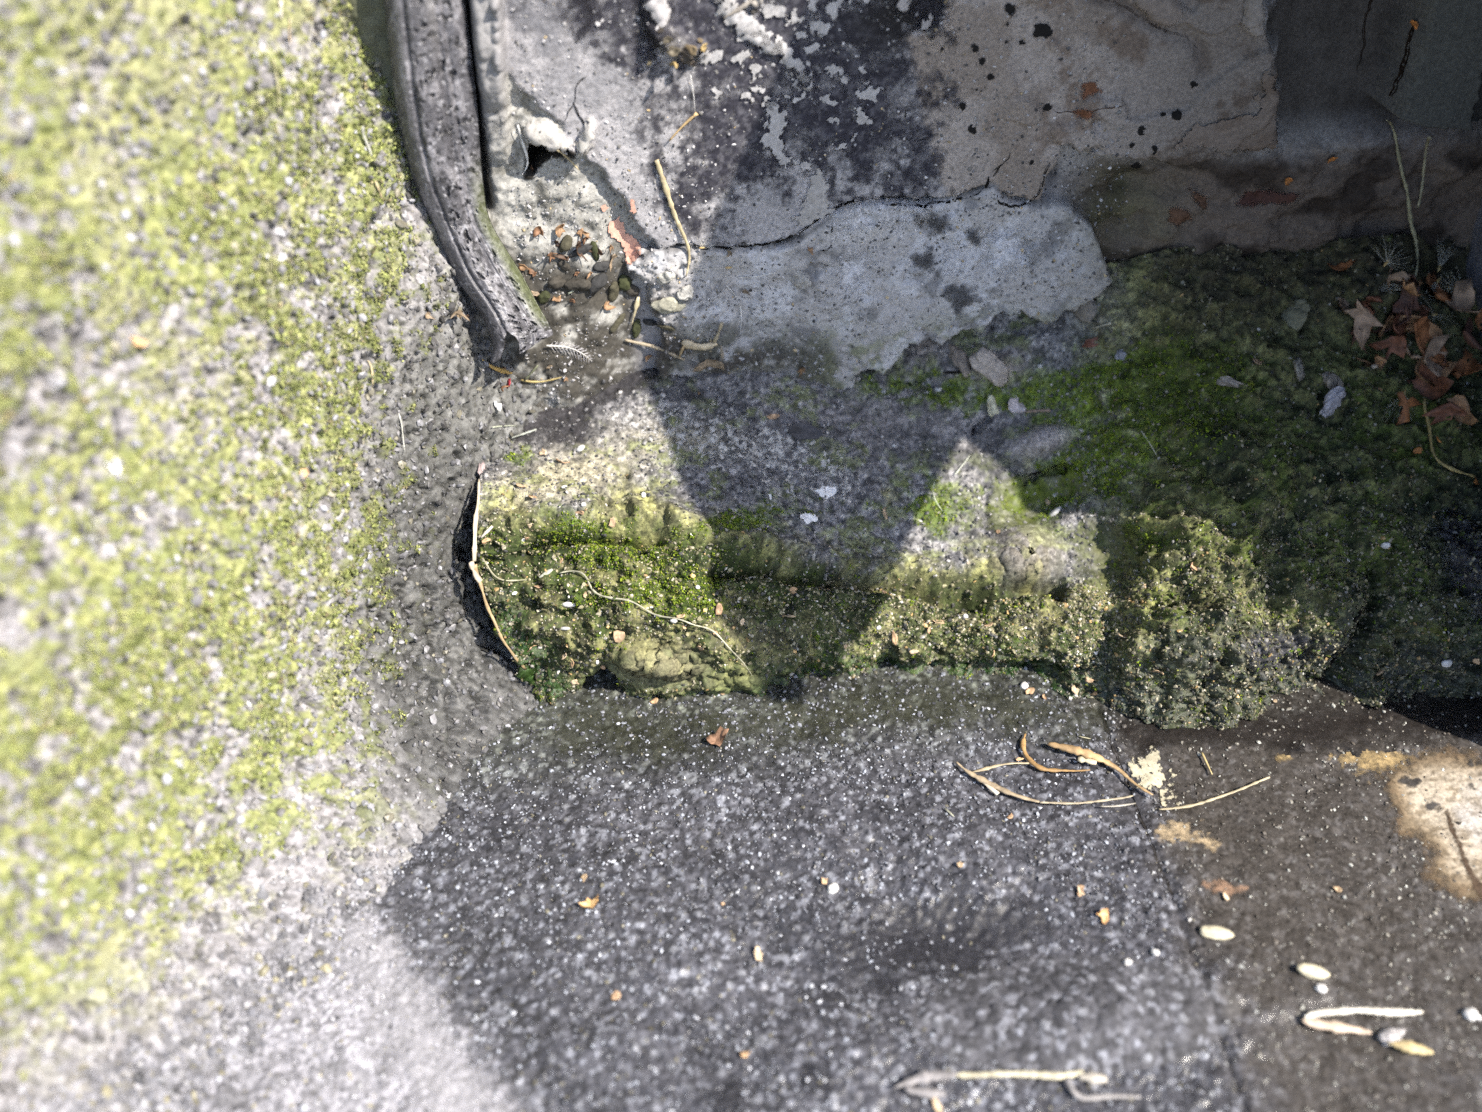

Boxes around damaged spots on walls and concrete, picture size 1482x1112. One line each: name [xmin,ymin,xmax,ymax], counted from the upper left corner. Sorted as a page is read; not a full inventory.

peeling [644,0,672,30]
peeling [896,0,911,11]
peeling [699,0,881,226]
peeling [523,117,596,180]
water stain [558,0,1029,314]
spalling [601,199,641,264]
crack [639,156,1050,251]
water stain [515,368,679,444]
water stain [800,513,818,524]
water stain [1439,511,1482,619]
water stain [1246,627,1308,676]